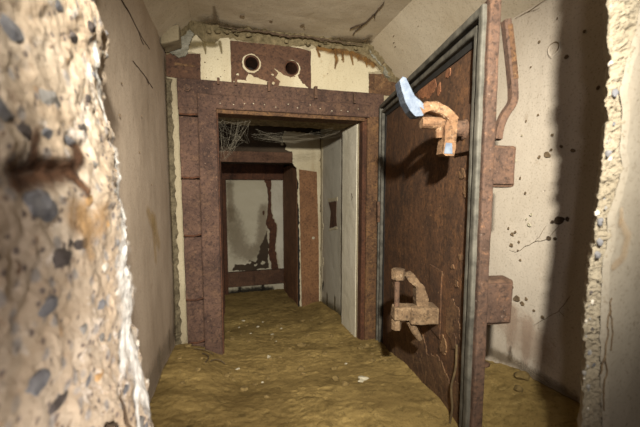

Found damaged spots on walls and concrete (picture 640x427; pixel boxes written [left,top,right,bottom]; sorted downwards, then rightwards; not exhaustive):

crack [121,0,150,49]
crack [219,2,384,46]
corrosion [418,68,451,99]
spalling [0,0,154,427]
spalling [165,20,400,346]
spalling [577,0,640,427]
corrosion [387,282,461,424]